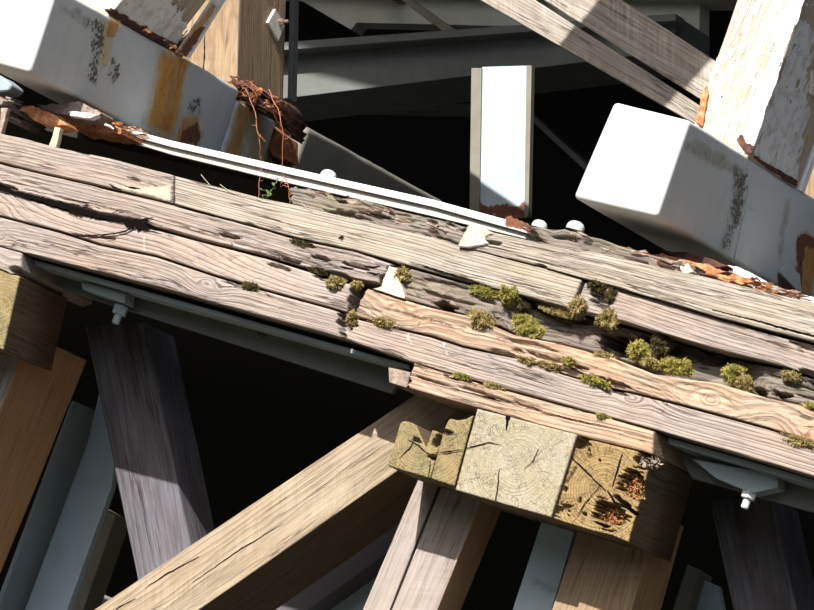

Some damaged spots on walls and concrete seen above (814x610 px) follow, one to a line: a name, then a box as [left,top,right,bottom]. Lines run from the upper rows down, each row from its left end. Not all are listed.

peeling [82,0,188,45]
rust [104,4,216,146]
peeling [695,0,814,180]
rust [737,135,798,187]
rust [480,201,529,230]
rust [654,233,814,297]